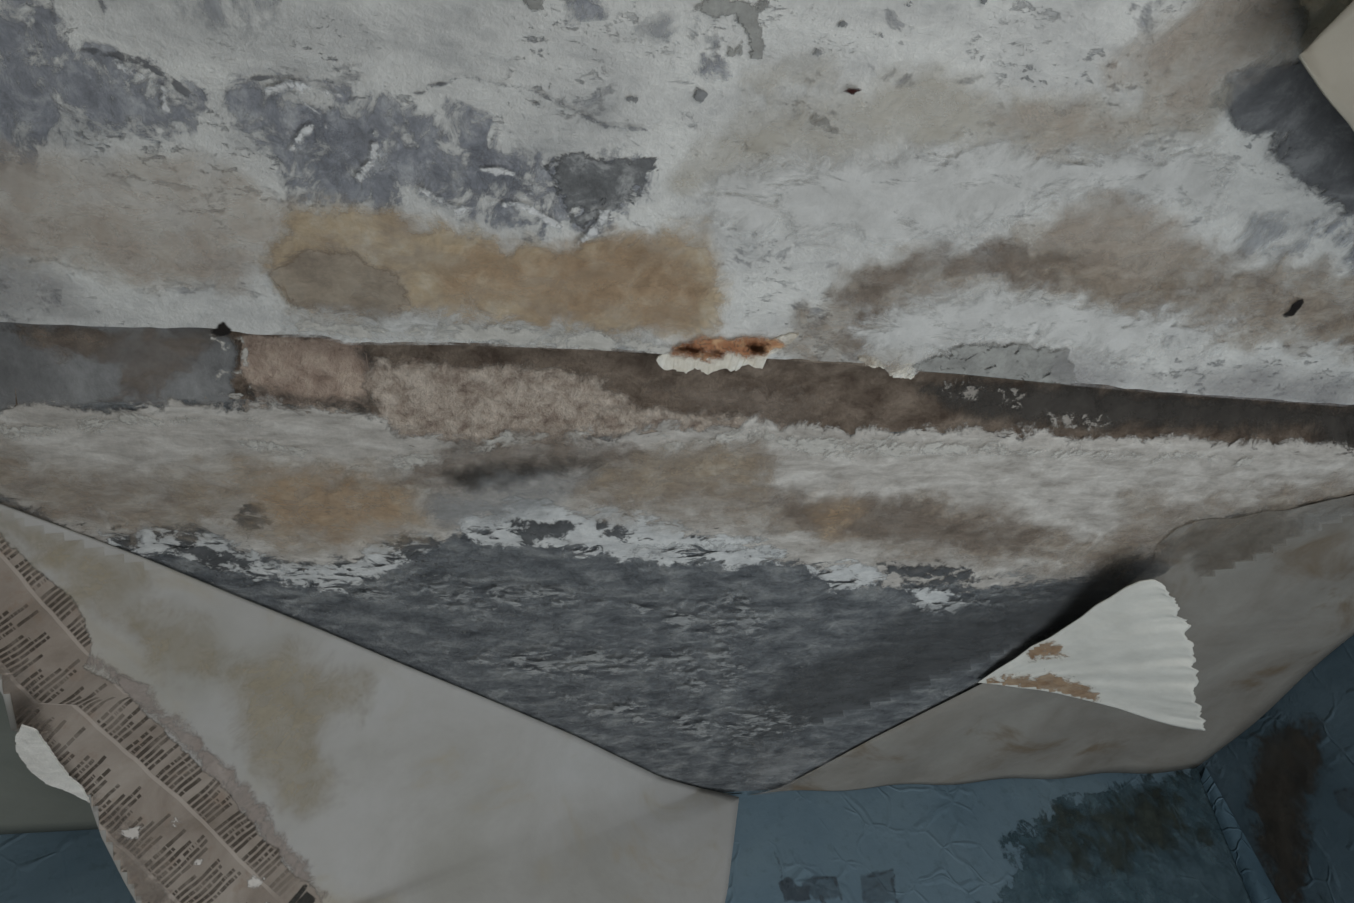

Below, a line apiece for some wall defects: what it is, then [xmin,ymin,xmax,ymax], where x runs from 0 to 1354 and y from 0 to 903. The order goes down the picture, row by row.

peeling [0,0,207,170]
peeling [524,0,544,12]
peeling [693,0,770,103]
peeling [225,75,657,244]
leakage [782,0,1354,373]
leakage [264,207,725,338]
rust [656,333,799,375]
leakage [920,380,1354,455]
leakage [0,430,1354,748]
peeling [15,724,90,803]
leakage [998,767,1252,903]
leakage [1247,720,1322,903]